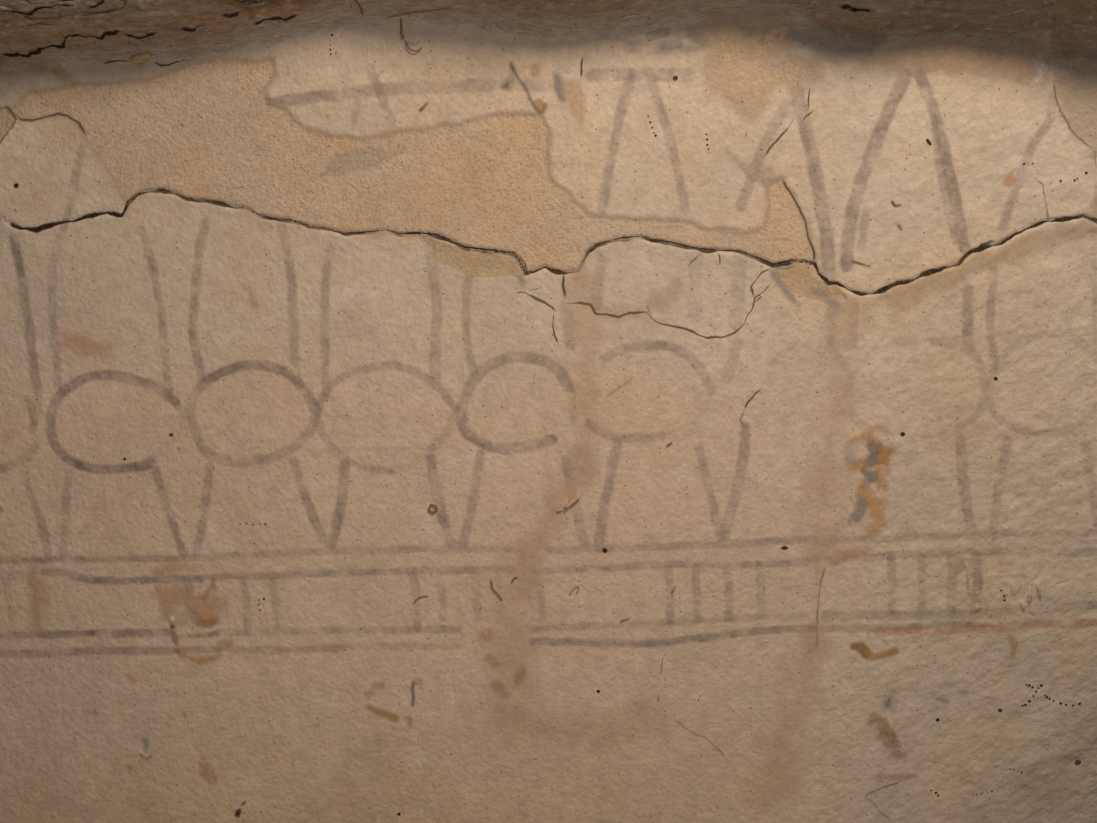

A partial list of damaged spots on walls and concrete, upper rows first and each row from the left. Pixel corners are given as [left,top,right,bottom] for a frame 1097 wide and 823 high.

crack [2,0,105,16]
crack [4,30,155,64]
crack [182,12,297,32]
crack [841,4,870,12]
crack [746,89,812,154]
crack [1054,85,1096,160]
flaking render [0,58,846,302]
crack [1,181,1097,341]